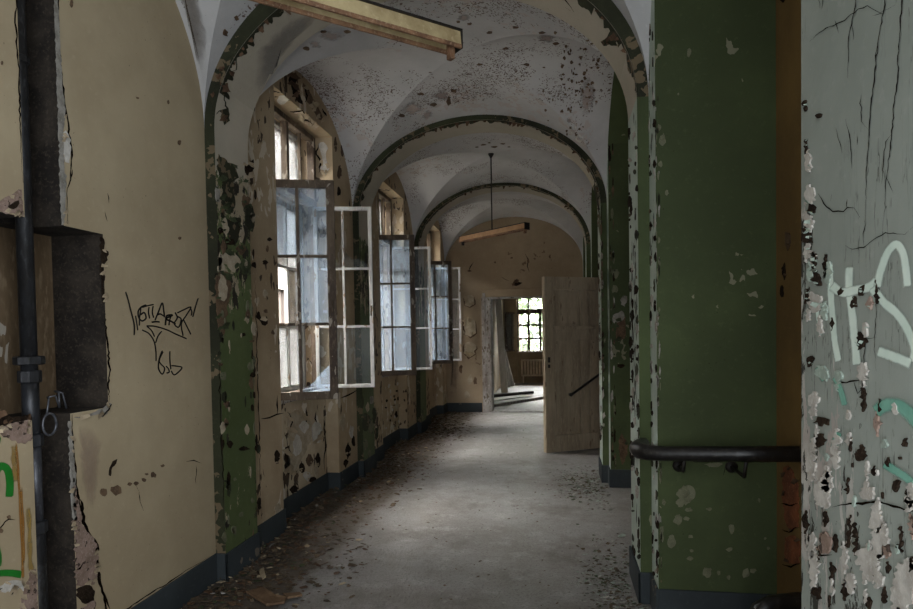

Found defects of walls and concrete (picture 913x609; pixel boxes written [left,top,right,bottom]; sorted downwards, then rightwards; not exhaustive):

crack [61,66,73,221]
peeling [210,9,291,125]
peeling [539,0,636,113]
crack [810,0,913,249]
peeling [215,154,275,411]
peeling [359,80,669,559]
peeling [785,184,880,337]
peeling [855,322,869,350]
spalling [0,410,32,444]
spalling [67,314,112,609]
peeling [780,362,913,609]
spalling [0,569,38,609]